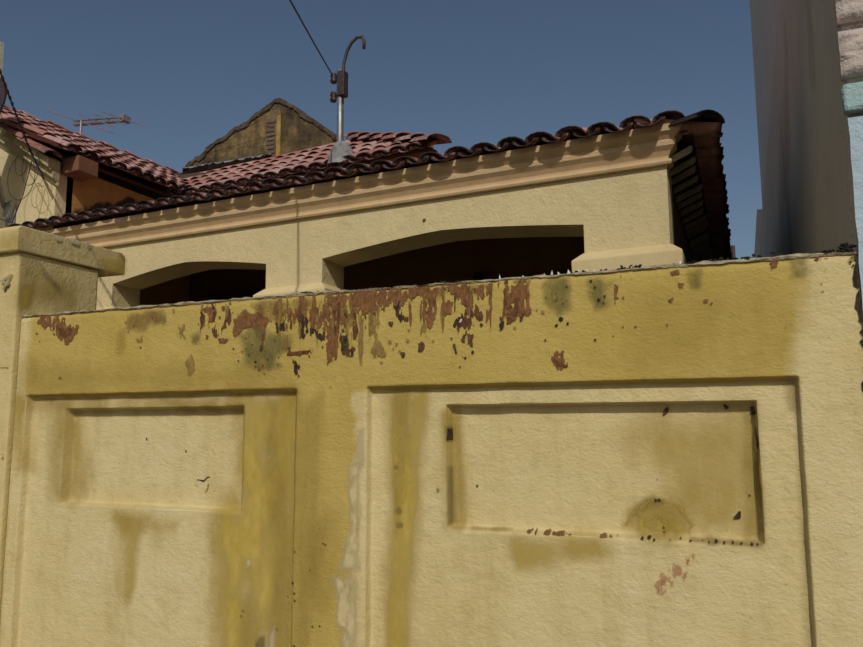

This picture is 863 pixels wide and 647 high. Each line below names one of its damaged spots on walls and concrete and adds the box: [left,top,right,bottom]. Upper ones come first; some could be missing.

peeling [36,314,79,345]
peeling [198,278,544,377]
spalling [551,350,568,370]
leakage [119,517,140,592]
leakage [388,392,425,647]